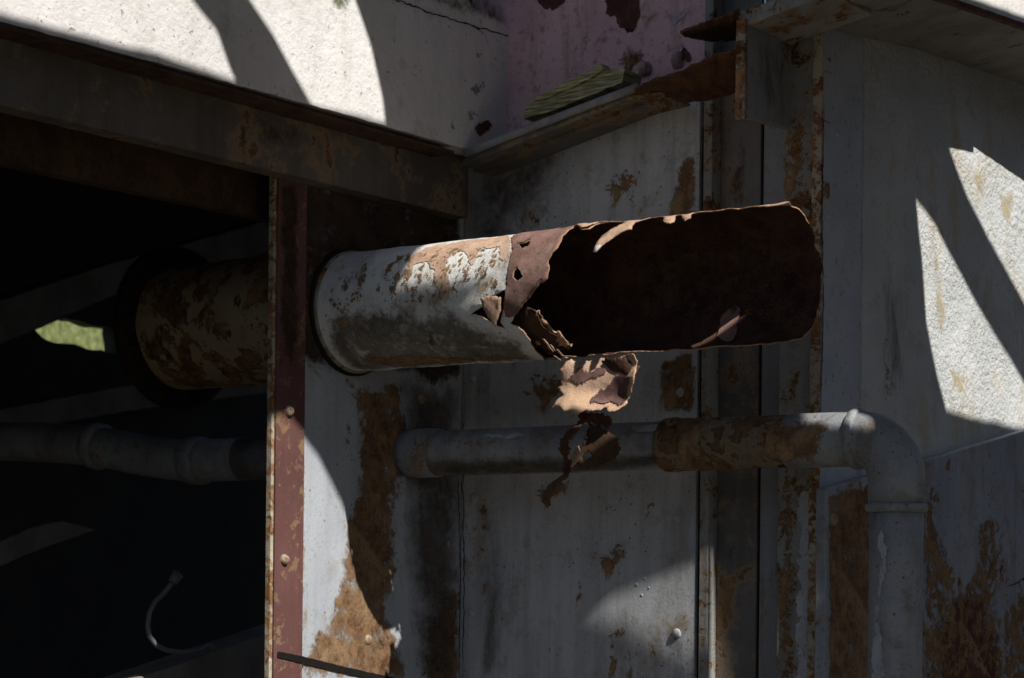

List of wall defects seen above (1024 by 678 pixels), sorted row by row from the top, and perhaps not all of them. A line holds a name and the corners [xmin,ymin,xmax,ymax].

crack [395,0,508,41]
peeling [604,0,640,32]
rust [573,170,645,228]
rust [669,158,696,216]
rust [653,350,704,412]
rust [304,379,460,678]
rust [747,415,839,678]
rust [829,475,869,678]
rust [922,484,1024,678]